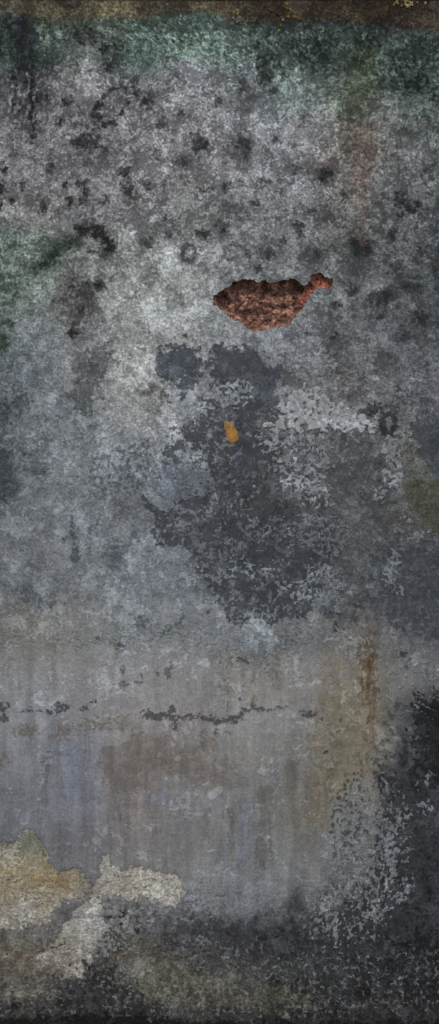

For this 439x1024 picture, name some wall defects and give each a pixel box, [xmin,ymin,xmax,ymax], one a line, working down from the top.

spalling [212,273,333,332]
damp [142,381,167,427]
corrosion [223,421,240,457]
damp [374,685,439,830]
peeling [0,697,439,1024]
damp [0,844,439,1024]